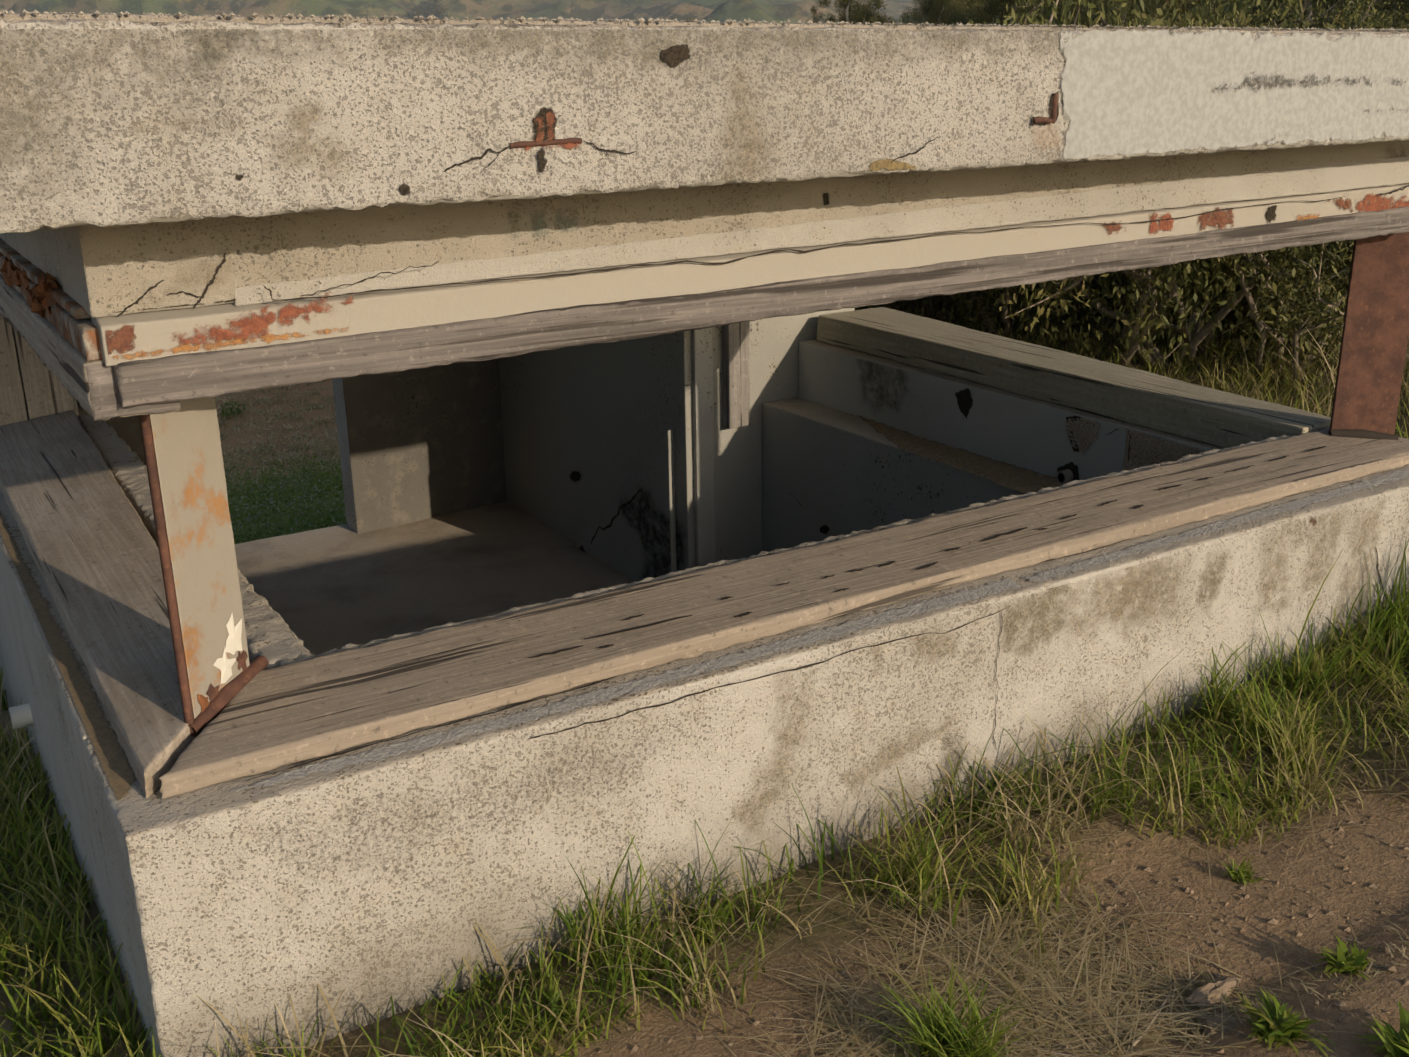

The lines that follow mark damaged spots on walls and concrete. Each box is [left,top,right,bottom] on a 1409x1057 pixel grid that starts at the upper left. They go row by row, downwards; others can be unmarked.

crack [444,146,511,172]
rust [509,108,582,172]
crack [583,141,635,157]
rust [1031,91,1059,126]
peeling [1060,30,1409,159]
crack [116,253,226,317]
rust [106,293,353,359]
damp [858,415,1065,494]
spalling [1123,429,1204,470]
damp [620,492,683,578]
damp [1006,587,1062,647]
peeling [197,613,248,712]